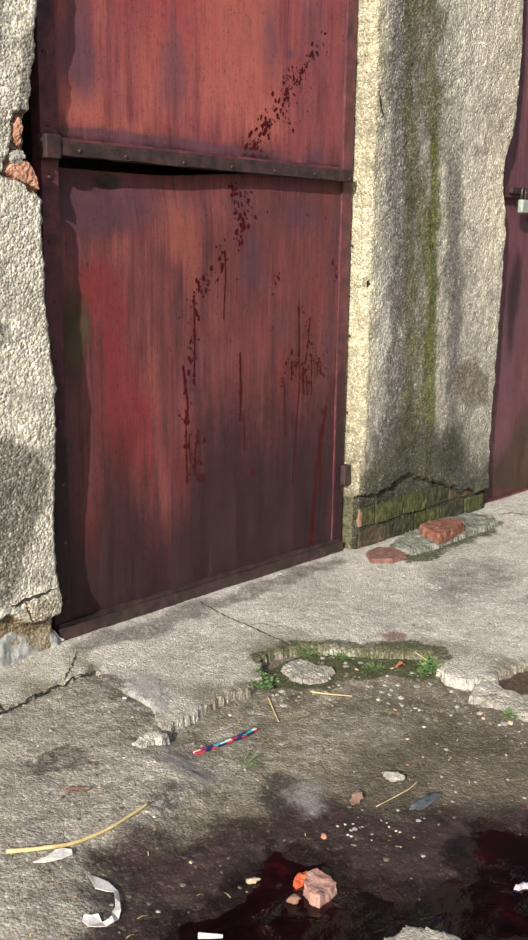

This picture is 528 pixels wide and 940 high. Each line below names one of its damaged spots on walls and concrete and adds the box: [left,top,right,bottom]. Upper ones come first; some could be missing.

spalling [0,111,39,196]
leakage [309,0,490,546]
leakage [281,306,328,497]
leakage [0,439,71,628]
spalling [351,475,489,549]
crack [9,575,58,623]
crack [0,648,96,714]